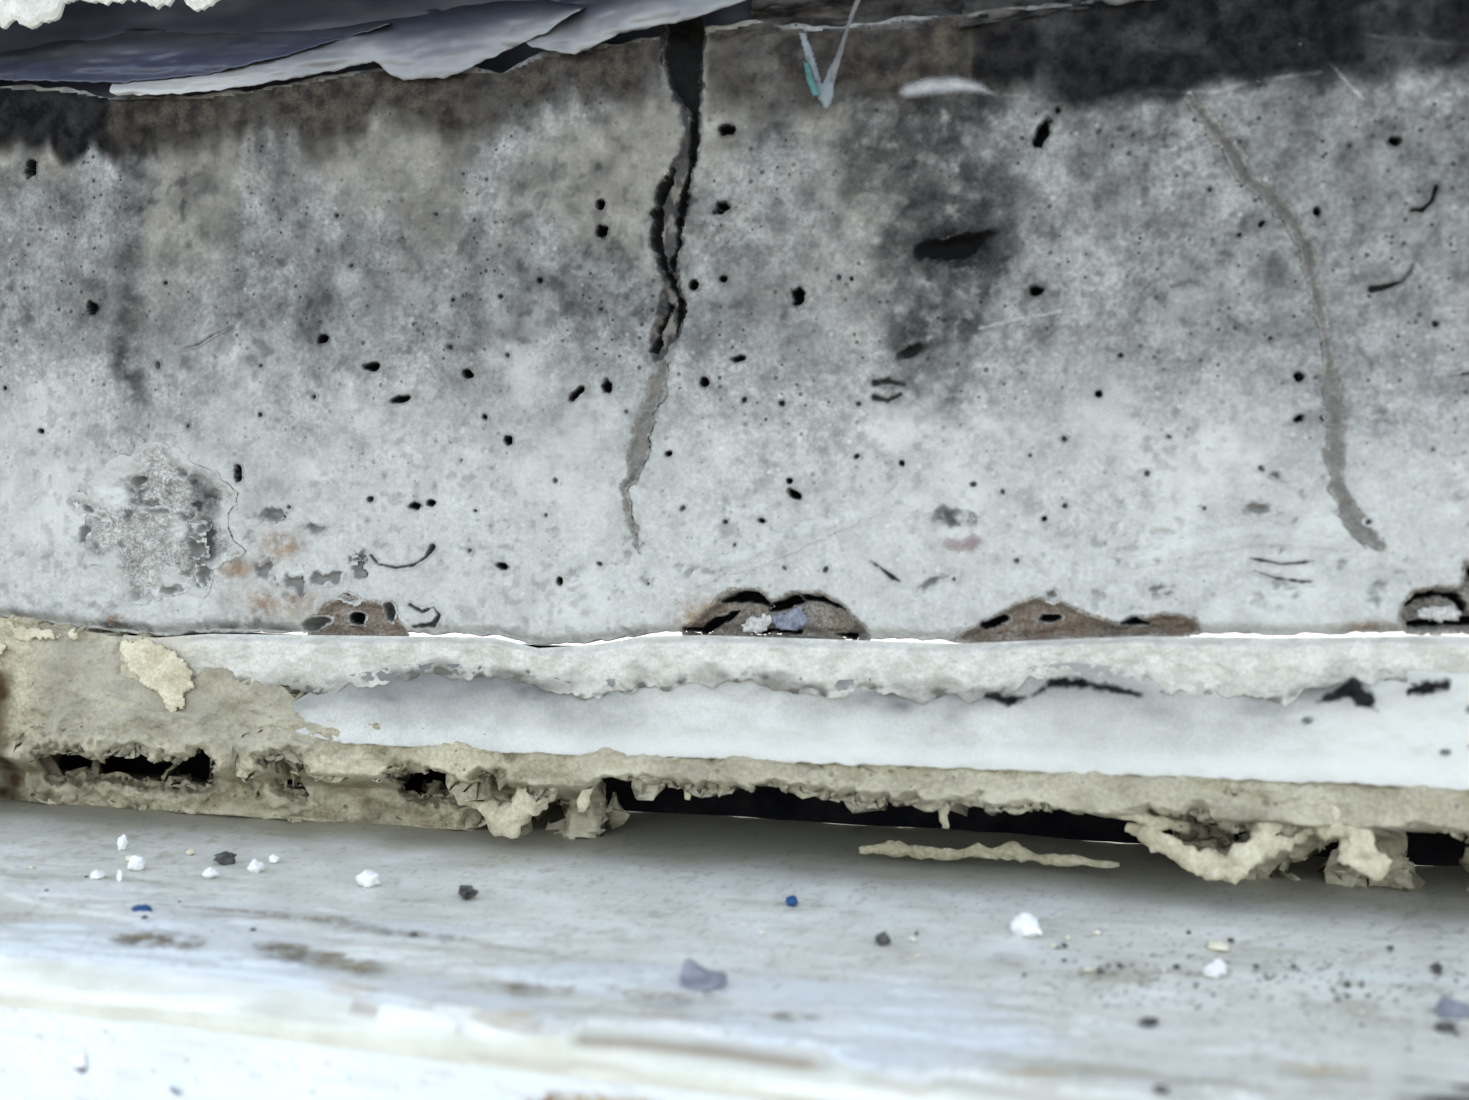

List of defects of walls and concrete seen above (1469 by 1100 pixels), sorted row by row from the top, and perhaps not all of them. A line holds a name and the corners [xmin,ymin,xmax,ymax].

damp [0,37,661,163]
damp [709,0,1469,349]
crack [619,15,707,555]
damp [116,289,139,387]
spalling [66,433,410,636]
peeling [0,621,78,665]
peeling [120,636,194,712]
spalling [680,587,871,641]
spalling [950,579,1201,643]
spalling [1398,558,1469,635]